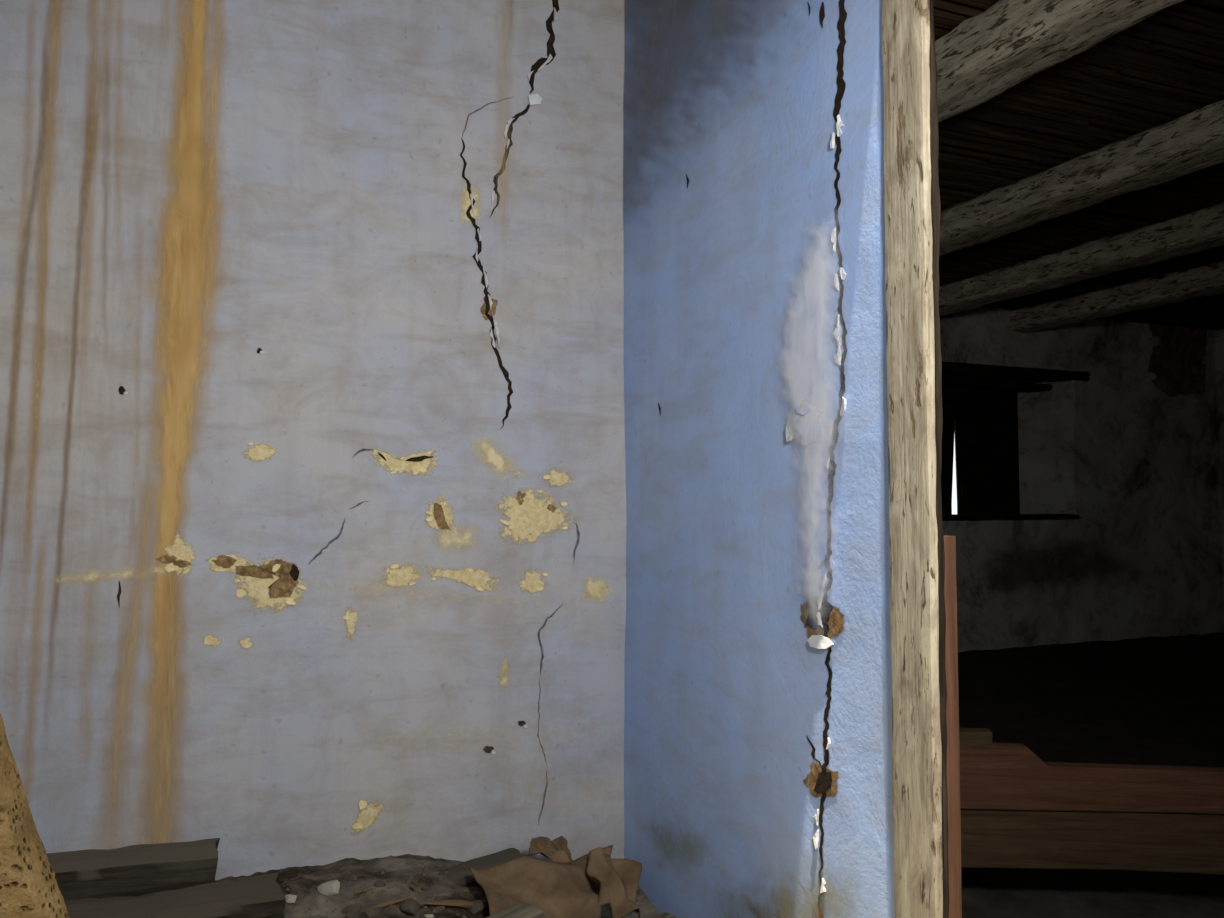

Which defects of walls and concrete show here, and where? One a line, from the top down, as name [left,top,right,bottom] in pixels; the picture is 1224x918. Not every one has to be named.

crack [460,0,560,428]
damp [57,271,87,590]
rust [112,0,218,844]
peeling [154,533,307,612]
peeling [372,448,439,476]
peeling [381,563,499,592]
peeling [481,442,576,545]
crack [800,0,847,910]
crack [538,605,562,818]